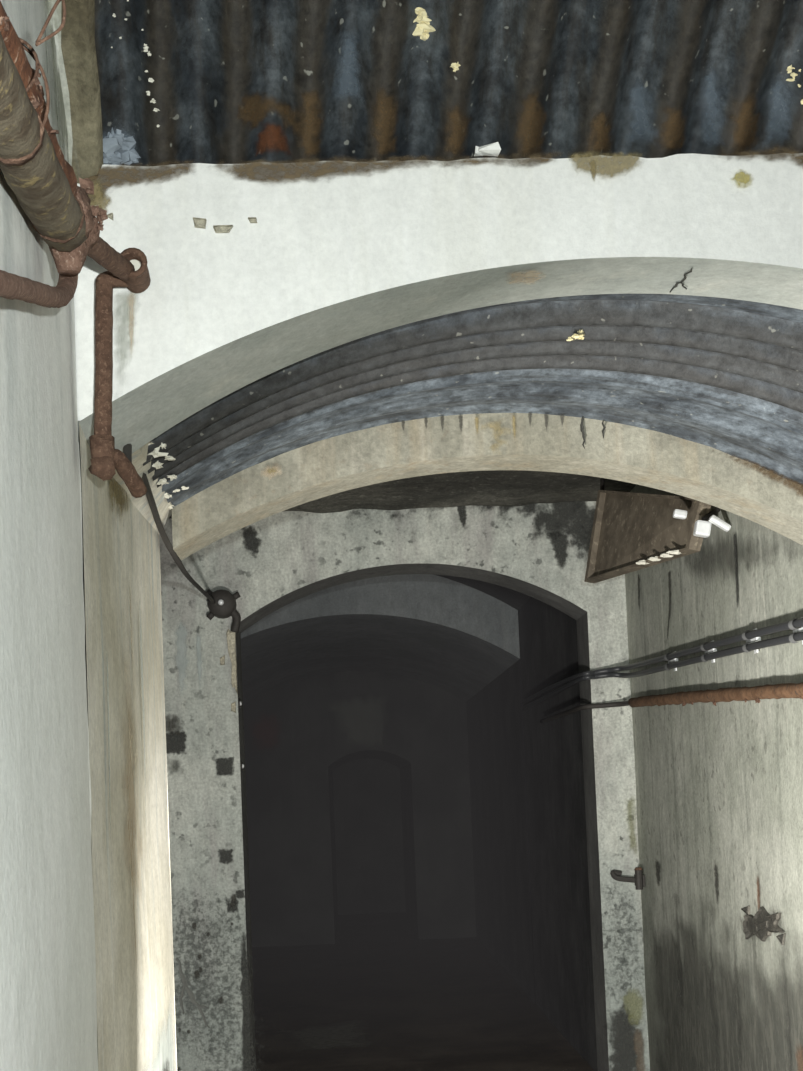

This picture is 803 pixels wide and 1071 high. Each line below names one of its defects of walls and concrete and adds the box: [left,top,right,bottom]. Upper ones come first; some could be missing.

rust [240,94,320,156]
rust [374,91,396,153]
rust [571,114,639,179]
water stain [734,172,751,186]
water stain [736,147,803,165]
crack [669,268,692,293]
water stain [457,501,595,567]
water stain [227,890,244,925]
spalling [741,878,786,945]
water stain [148,901,256,1071]
water stain [655,925,803,1071]